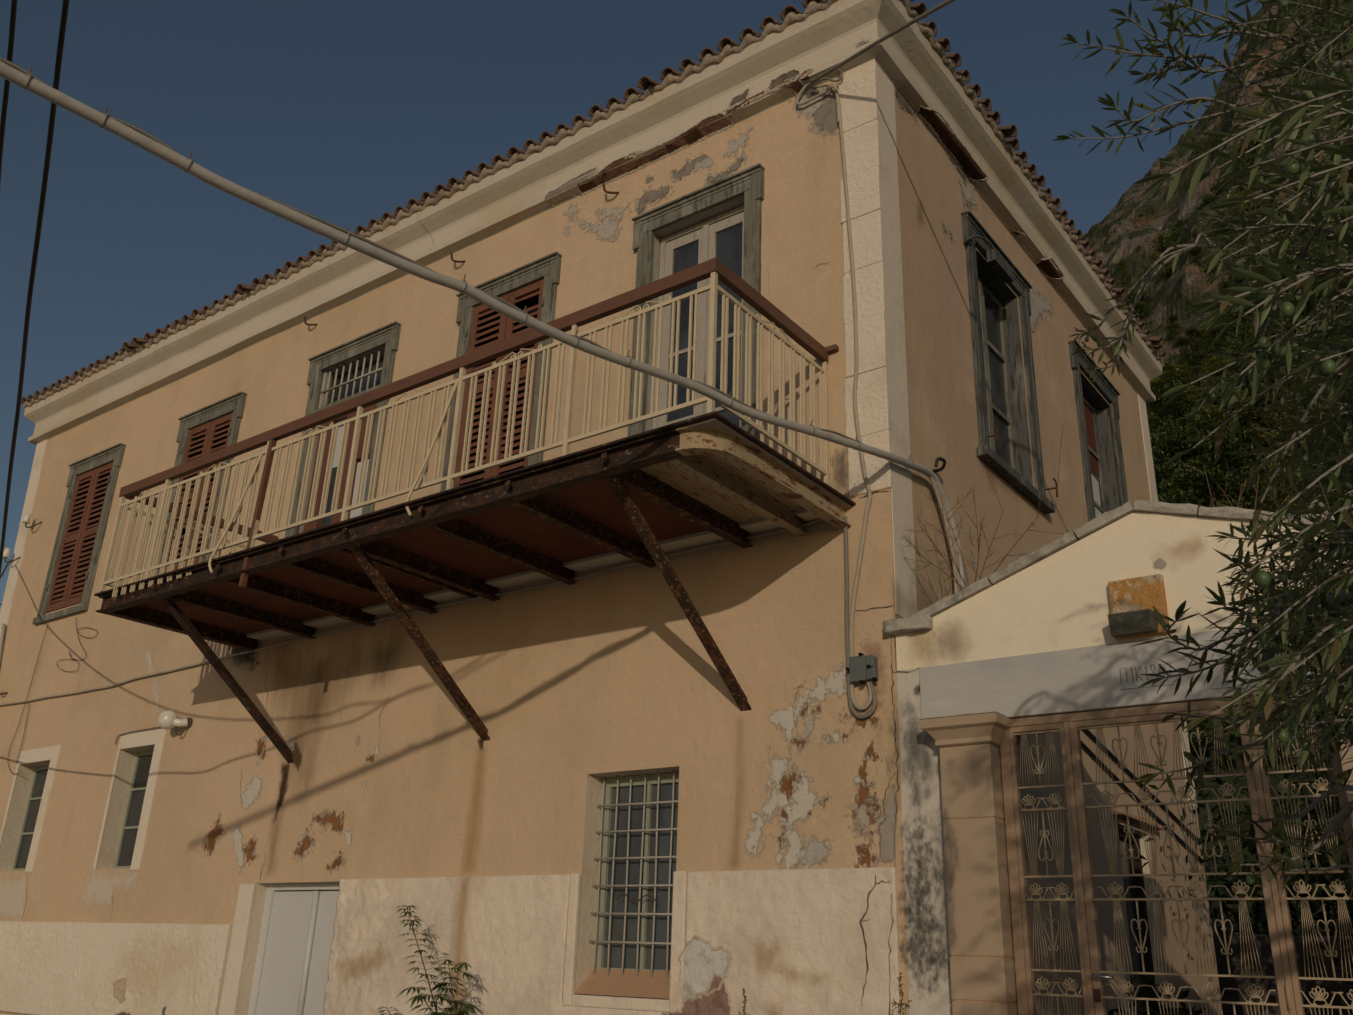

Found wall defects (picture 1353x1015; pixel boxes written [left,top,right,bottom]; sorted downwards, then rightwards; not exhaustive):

flaking render [544,67,840,242]
peeling [294,808,352,870]
flaking render [661,935,733,1015]
peeling [744,650,887,870]
crack [855,605,920,1015]
leakage [904,830,953,990]